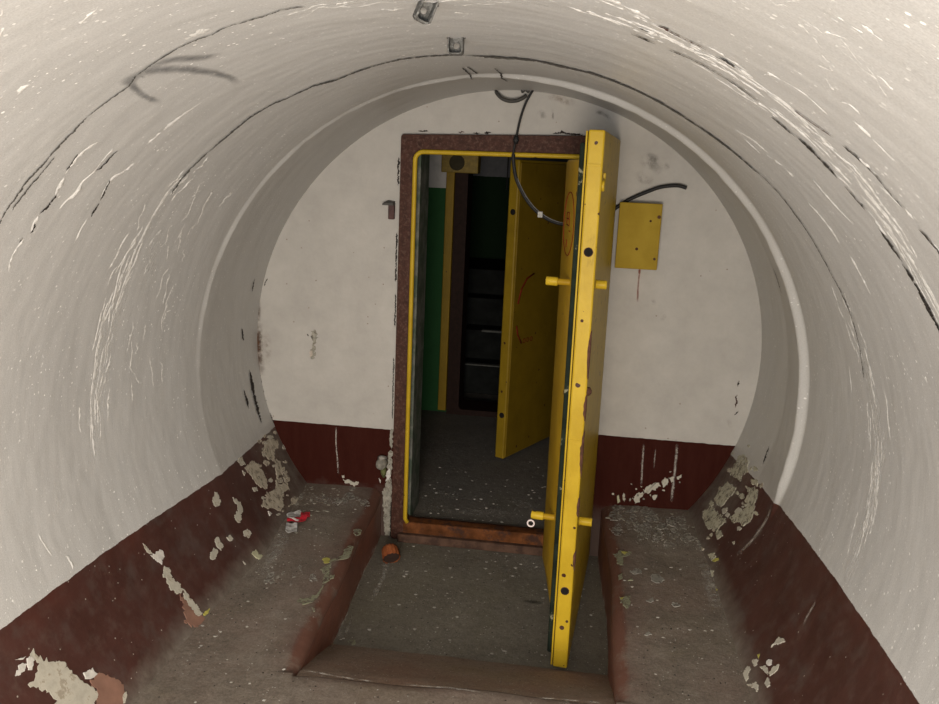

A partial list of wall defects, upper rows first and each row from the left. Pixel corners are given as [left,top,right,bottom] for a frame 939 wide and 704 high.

crack [0,7,302,224]
crack [634,26,903,210]
crack [878,228,939,331]
peeling [238,431,303,516]
peeling [609,445,763,583]
peeling [143,544,210,627]
peeling [15,648,127,704]
peeling [743,654,779,692]